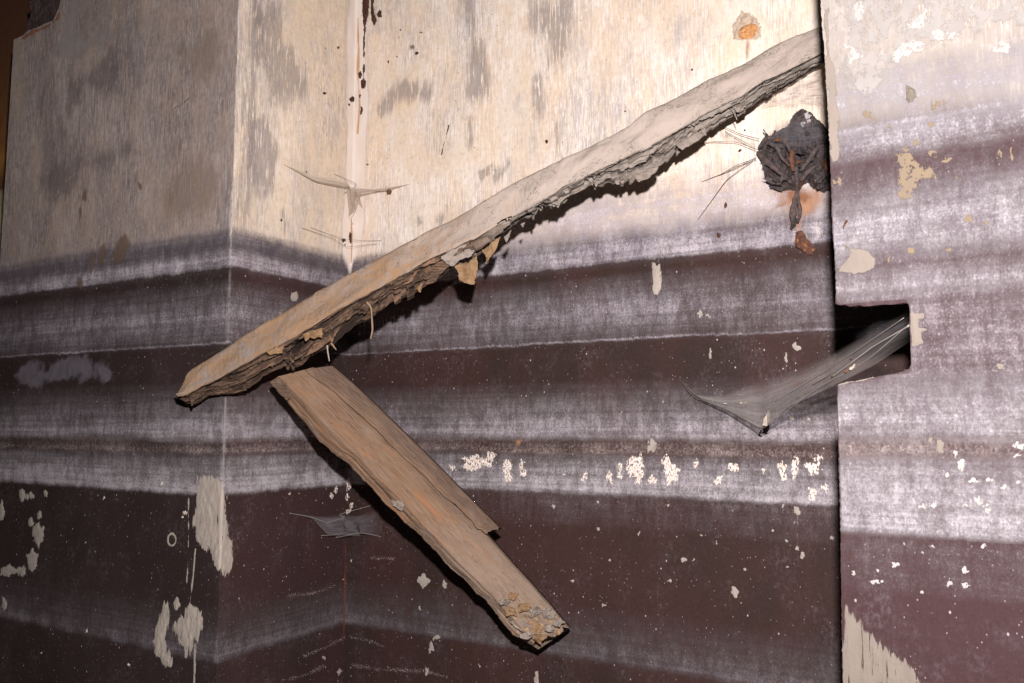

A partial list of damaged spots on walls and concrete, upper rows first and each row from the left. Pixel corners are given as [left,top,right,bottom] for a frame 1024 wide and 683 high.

peeling [836,0,1024,96]
spalling [906,85,916,102]
corrosion [764,164,829,255]
peeling [895,139,952,200]
leakage [0,297,287,388]
leakage [321,166,1024,541]
leakage [0,410,365,493]
peeling [449,452,526,484]
peeling [606,453,681,486]
peeling [761,455,827,501]